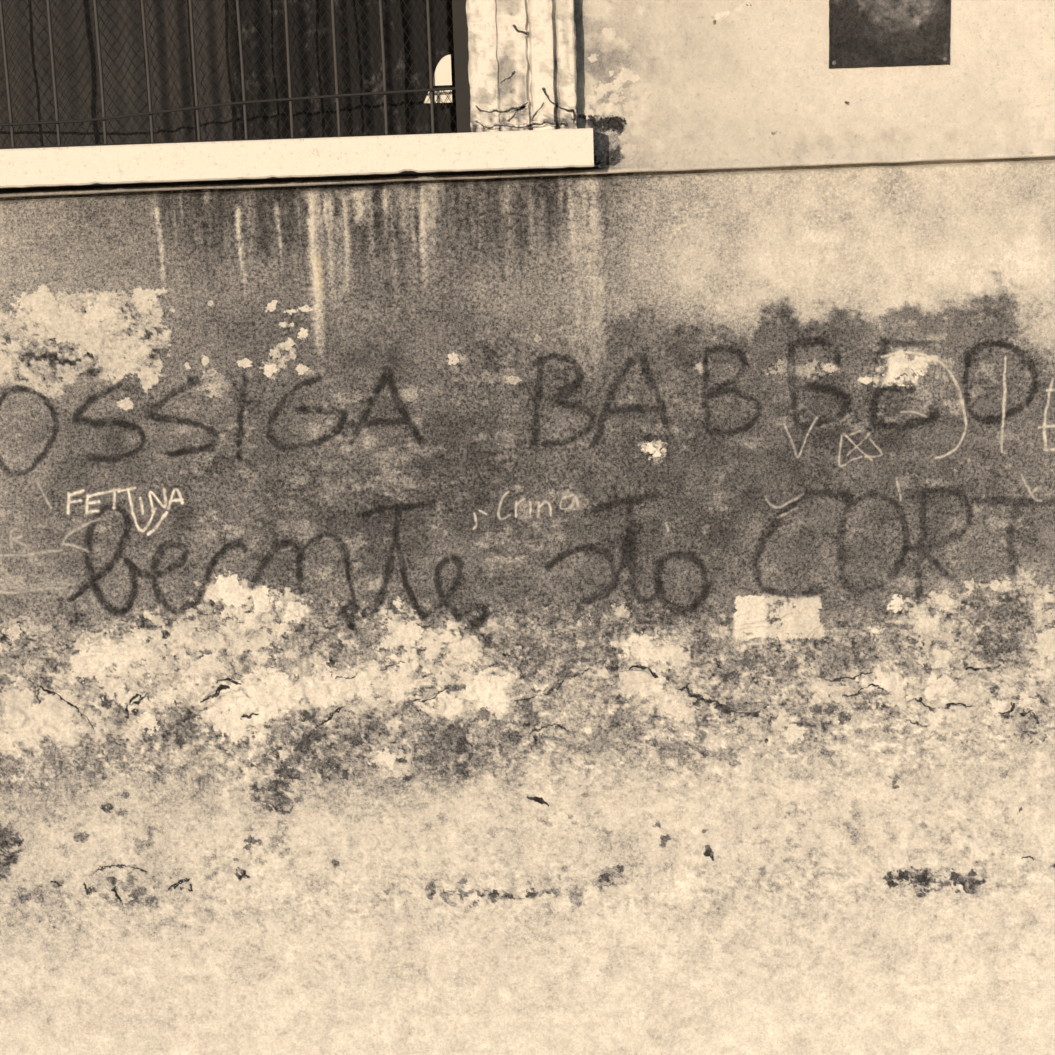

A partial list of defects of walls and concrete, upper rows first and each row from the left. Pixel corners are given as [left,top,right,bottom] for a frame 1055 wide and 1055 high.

peeling [577,26,648,168]
peeling [0,281,315,411]
leakage [0,173,1055,652]
peeling [0,564,1055,886]
spalling [420,876,564,914]
spalling [586,857,634,897]
spalling [876,862,994,906]
crack [1020,855,1055,869]